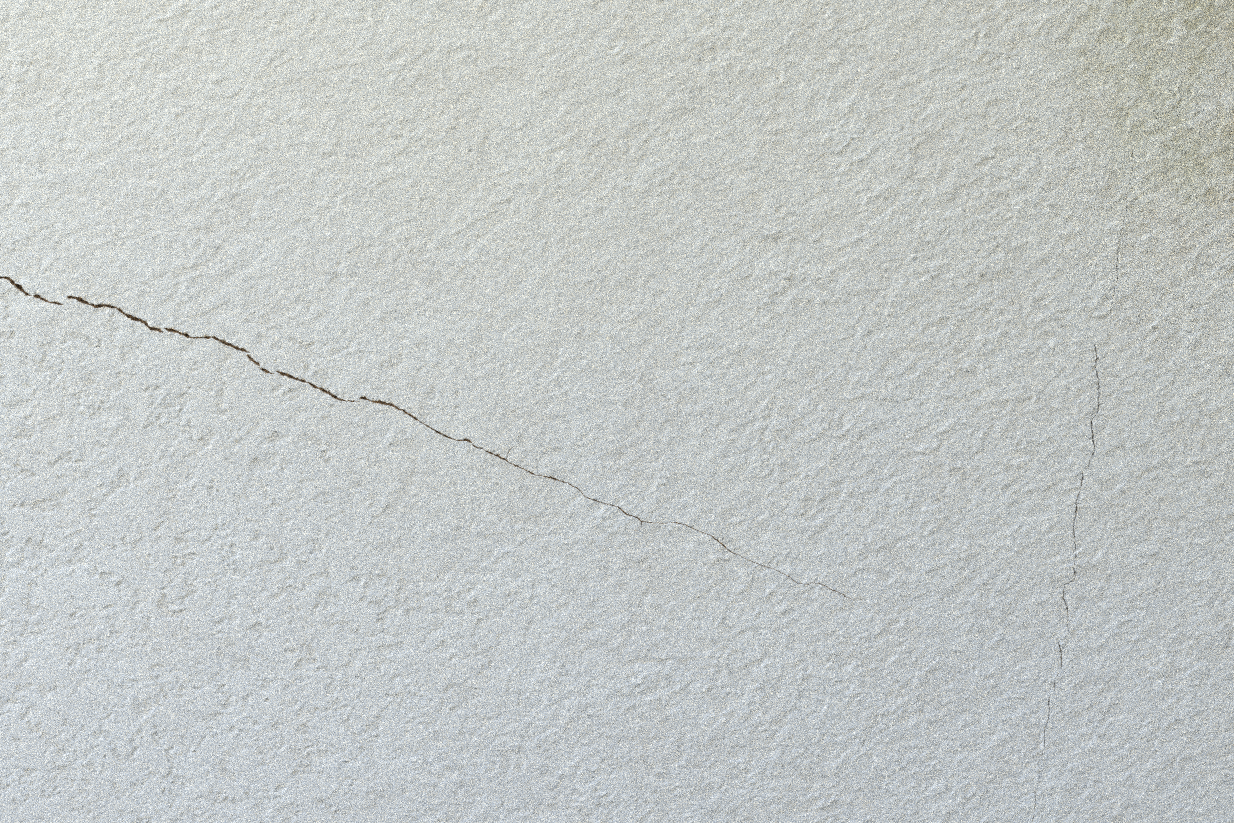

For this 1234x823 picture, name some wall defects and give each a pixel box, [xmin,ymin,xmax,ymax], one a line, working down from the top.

crack [0,271,869,605]